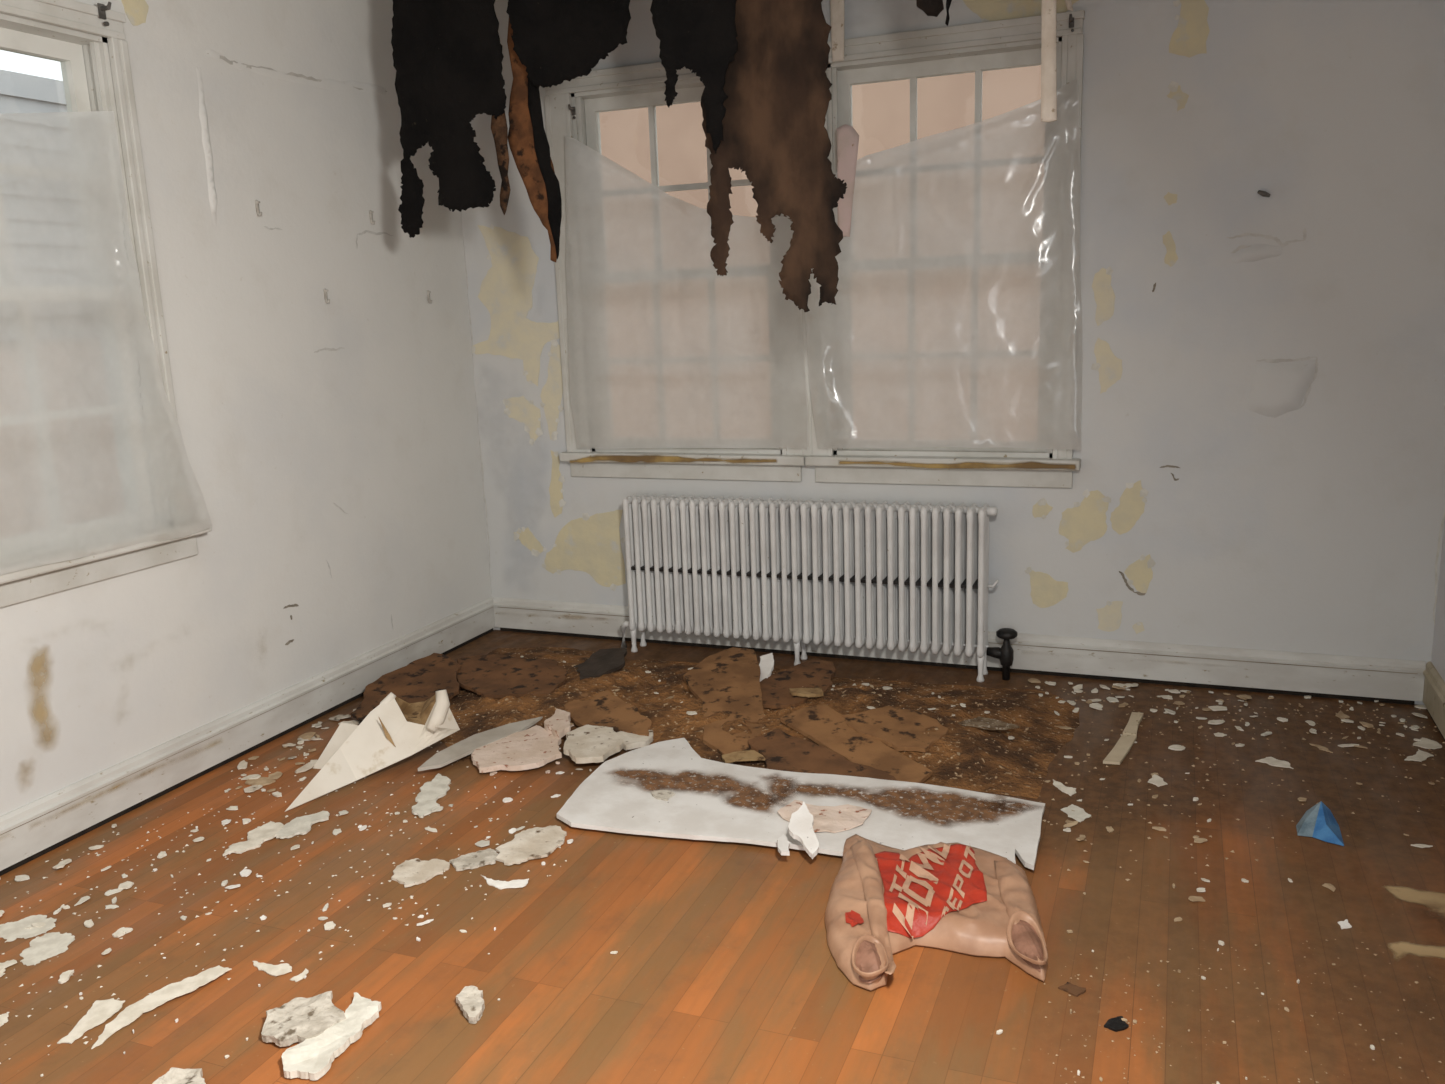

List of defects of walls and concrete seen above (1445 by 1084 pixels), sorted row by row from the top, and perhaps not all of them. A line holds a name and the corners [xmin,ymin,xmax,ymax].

peeling [963,0,1079,22]
peeling [1169,0,1210,58]
peeling [471,224,626,591]
peeling [1032,480,1149,553]
peeling [1025,567,1069,608]
leakage [1385,886,1445,916]
leakage [1389,942,1445,958]